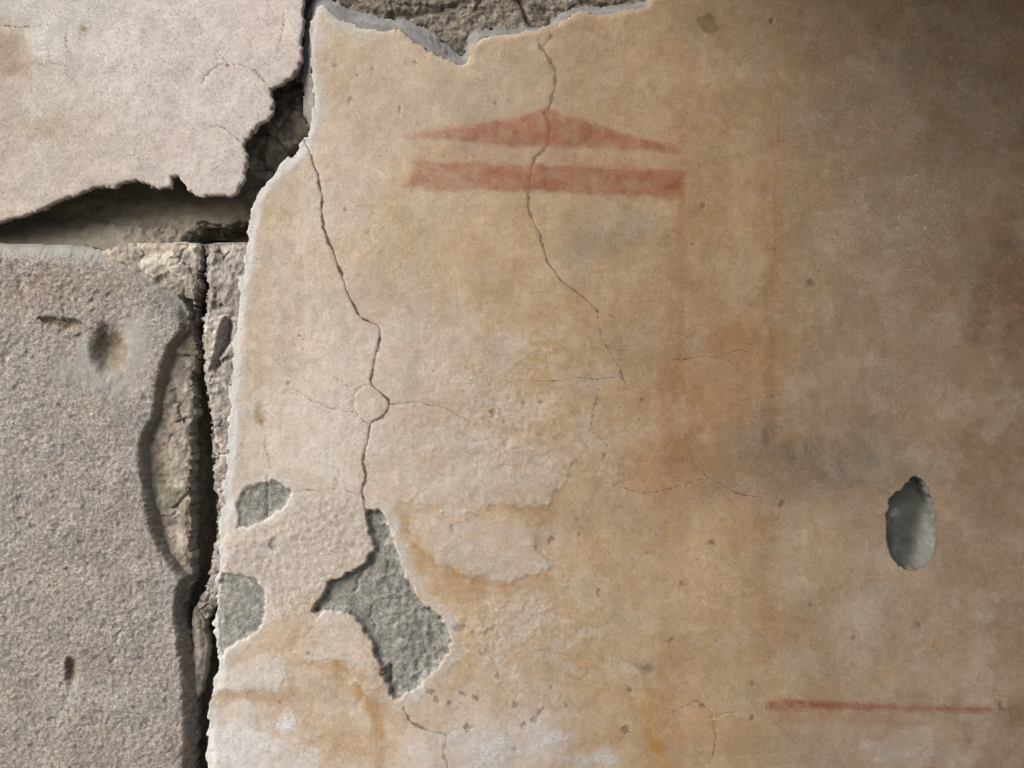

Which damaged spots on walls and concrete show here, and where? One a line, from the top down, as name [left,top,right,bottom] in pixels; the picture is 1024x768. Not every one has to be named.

crack [517,0,624,446]
crack [297,139,475,510]
crack [191,227,248,768]
flaking render [219,573,265,655]
flaking render [237,480,292,527]
flaking render [314,502,459,704]
crack [402,707,466,768]